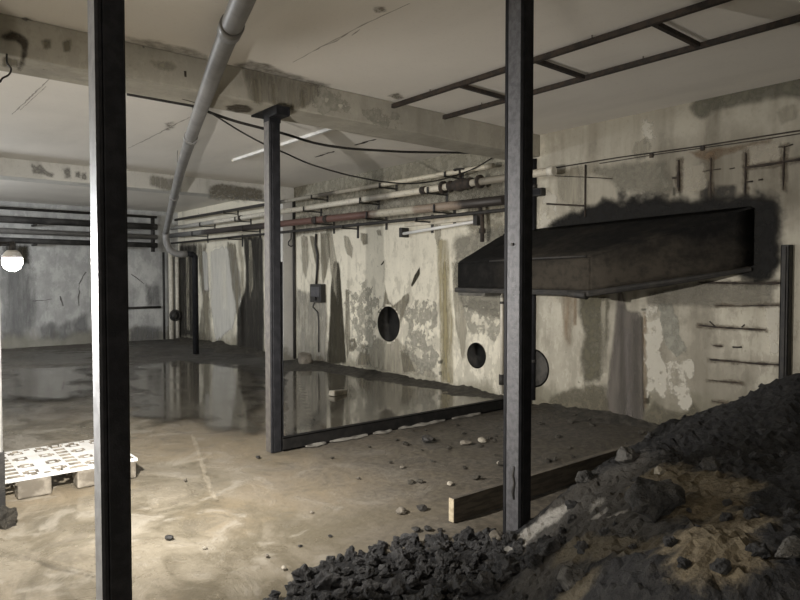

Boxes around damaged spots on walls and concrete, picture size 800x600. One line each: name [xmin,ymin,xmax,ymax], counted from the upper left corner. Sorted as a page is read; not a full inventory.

crack [294,3,410,62]
leakage [239,64,320,110]
leakage [692,79,800,121]
crack [34,272,87,306]
leakage [227,236,264,351]
peeling [345,282,380,354]
peeling [402,299,442,374]
leakage [549,292,697,425]
peeling [644,303,694,410]